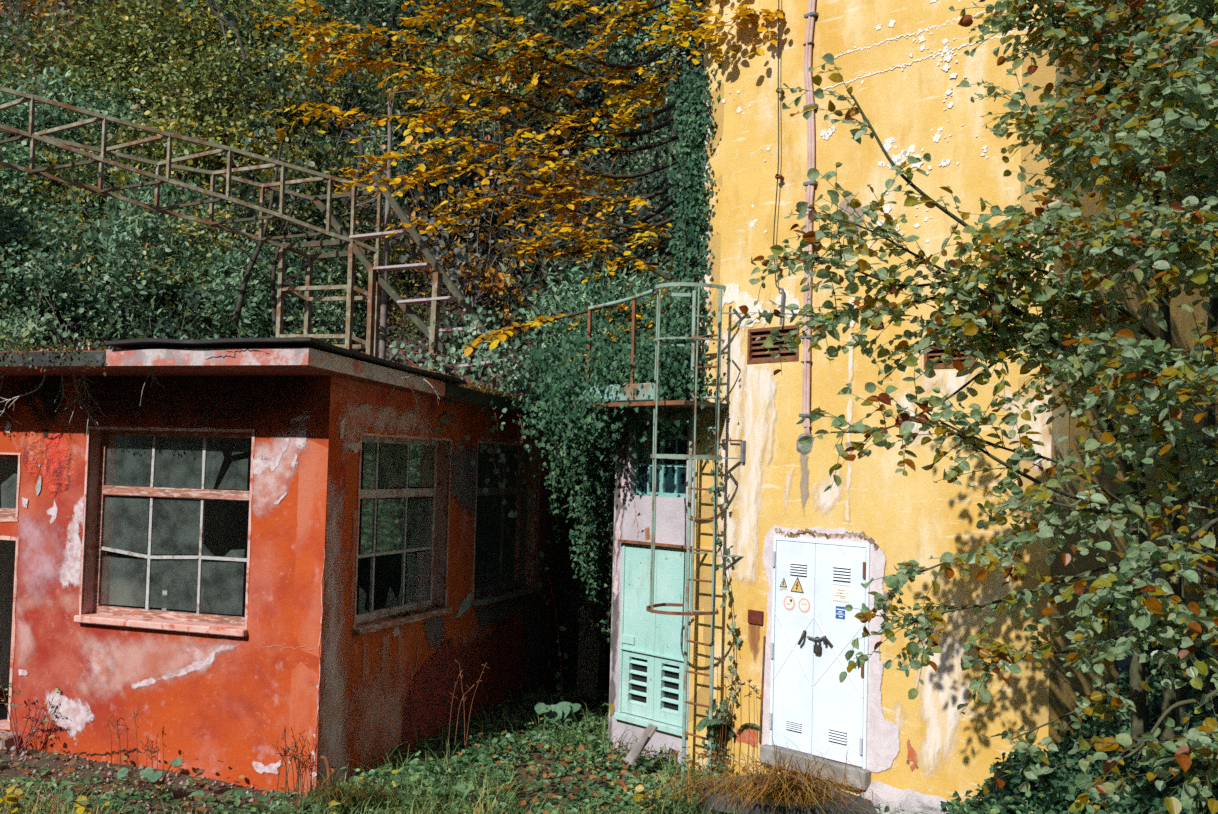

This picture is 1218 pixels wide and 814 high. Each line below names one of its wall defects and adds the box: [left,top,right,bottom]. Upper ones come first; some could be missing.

peeling [820,0,1028,174]
damp [702,89,713,187]
spalling [22,474,42,508]
peeling [253,414,310,515]
peeling [340,404,431,453]
damp [698,203,776,582]
peeling [45,496,84,587]
peeling [45,690,94,740]
peeling [131,642,239,688]
damp [917,635,969,774]
spalling [252,760,291,774]